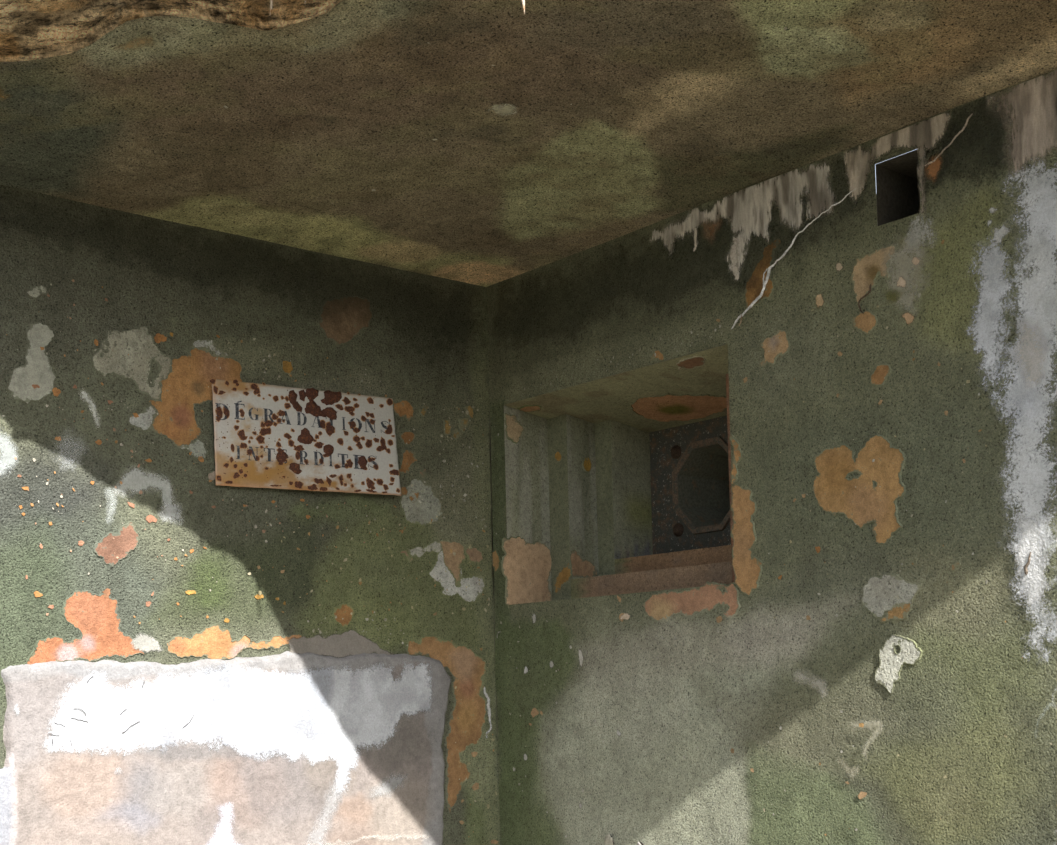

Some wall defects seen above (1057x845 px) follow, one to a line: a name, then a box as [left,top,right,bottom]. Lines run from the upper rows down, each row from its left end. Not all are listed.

spalling [0,0,343,62]
crack [925,113,973,166]
water stain [652,164,834,280]
crack [731,189,855,329]
crack [858,284,871,314]
peeling [91,325,243,480]
water stain [845,70,1057,662]
peeling [398,536,573,609]
crack [1024,544,1057,575]
peeling [23,588,393,665]
flaking render [875,634,923,695]
water stain [44,663,432,845]